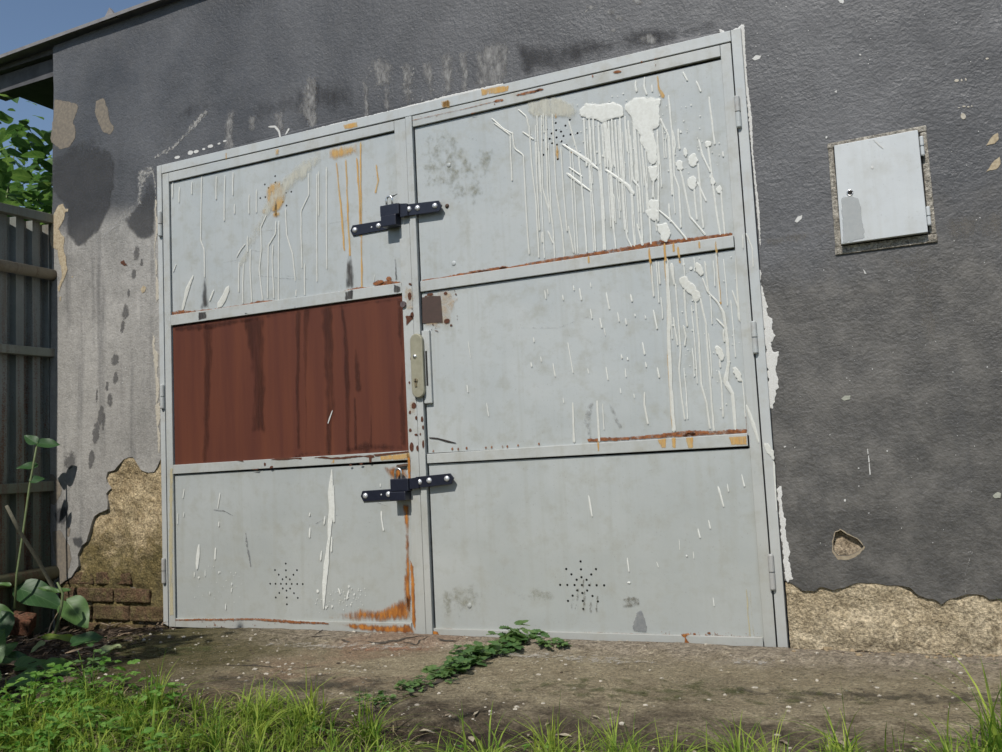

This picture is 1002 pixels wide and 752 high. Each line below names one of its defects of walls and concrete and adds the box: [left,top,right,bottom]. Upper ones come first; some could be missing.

damp [302,78,316,127]
corrosion [415,86,543,120]
damp [363,0,681,116]
damp [52,146,156,332]
corrosion [172,300,272,315]
corrosion [332,142,410,291]
corrosion [422,233,732,331]
damp [88,354,119,469]
flaking render [53,457,169,632]
corrosion [349,539,416,633]
flaking render [832,529,865,560]
flaking render [785,581,1002,656]